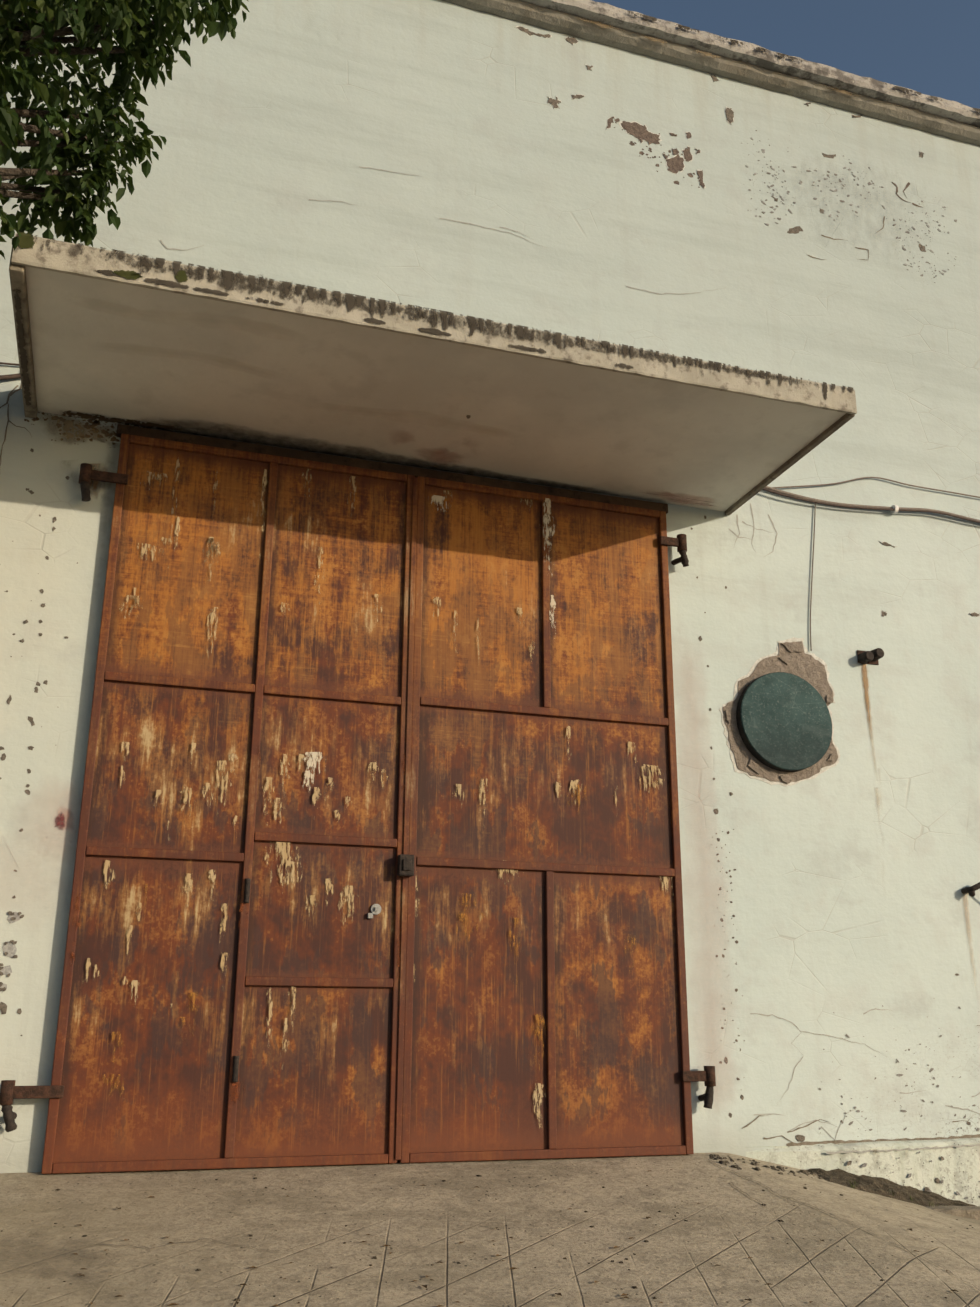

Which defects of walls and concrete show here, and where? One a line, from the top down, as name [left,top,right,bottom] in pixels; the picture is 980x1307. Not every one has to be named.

peeling [515,26,578,45]
peeling [546,94,585,109]
peeling [605,116,706,189]
crack [0,385,30,465]
rust [863,664,871,728]
peeling [7,895,24,923]
peeling [0,940,22,1014]
crack [742,1008,980,1154]